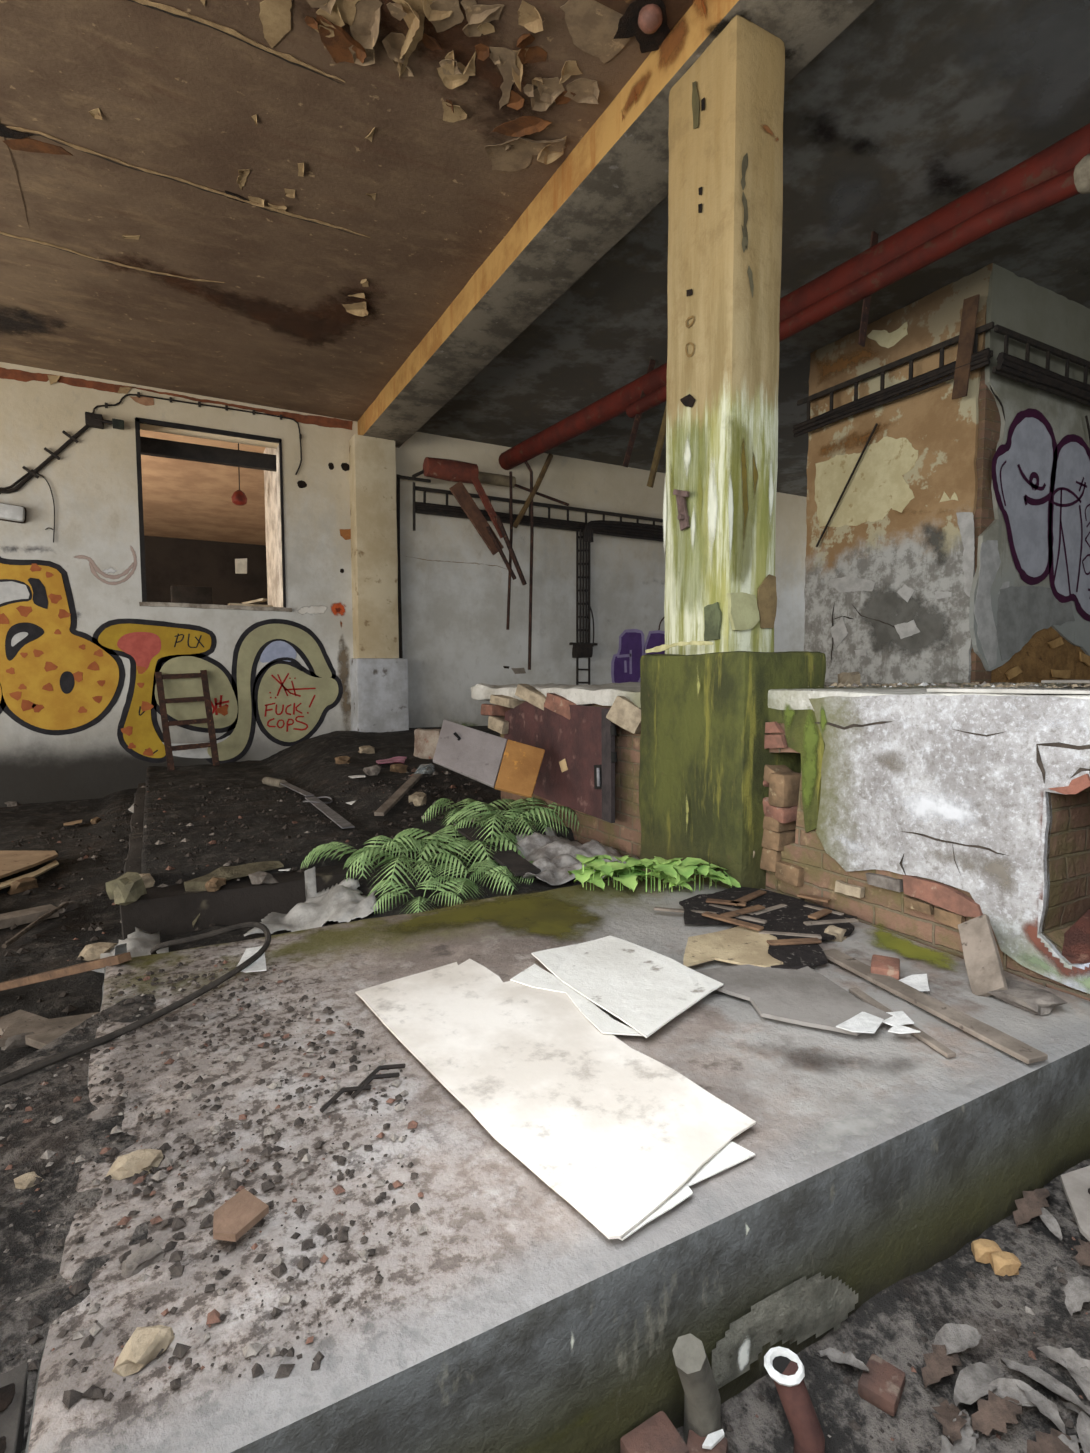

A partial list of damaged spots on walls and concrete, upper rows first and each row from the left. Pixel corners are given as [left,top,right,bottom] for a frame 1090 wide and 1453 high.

crack [128,0,345,84]
peeling [259,0,670,172]
crack [0,122,371,284]
damp [0,308,65,334]
damp [109,257,374,345]
peeling [867,322,908,348]
damp [691,441,774,550]
peeling [815,436,918,527]
peeling [894,620,920,639]
damp [784,705,827,806]
crack [1036,742,1090,783]
crack [899,831,1009,875]